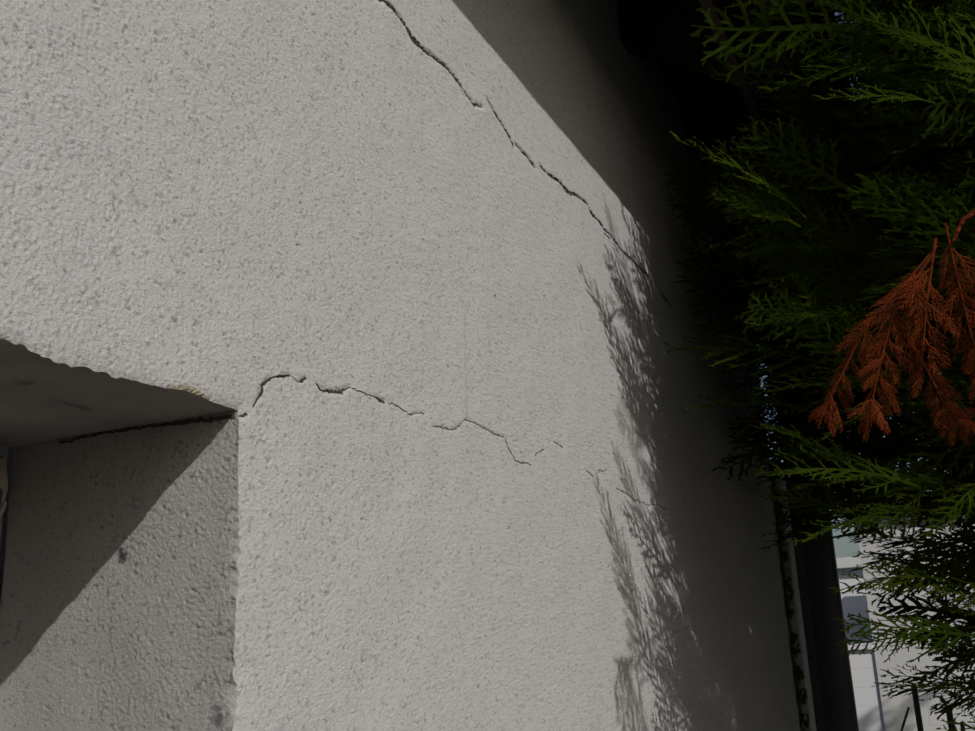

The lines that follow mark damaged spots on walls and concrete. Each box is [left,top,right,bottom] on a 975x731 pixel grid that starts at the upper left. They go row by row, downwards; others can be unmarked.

crack [378,0,671,306]
crack [58,303,563,465]
crack [586,468,666,511]